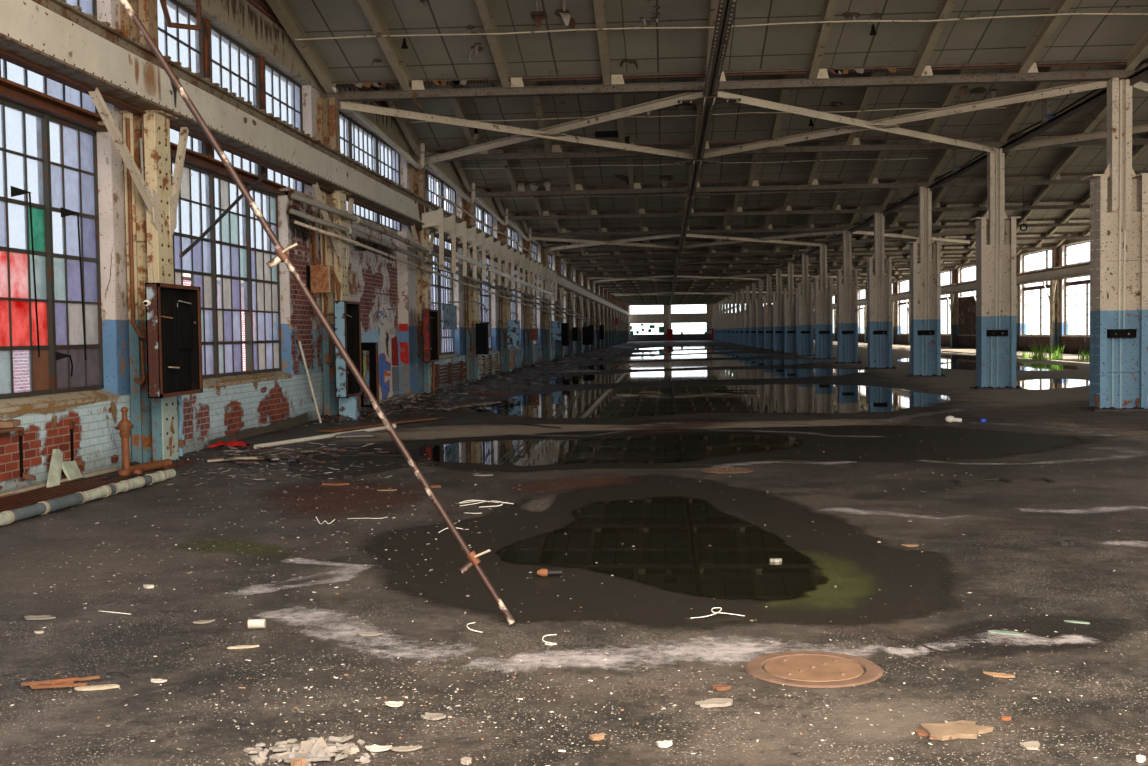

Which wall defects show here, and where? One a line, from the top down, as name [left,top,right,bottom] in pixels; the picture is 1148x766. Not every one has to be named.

peeling [289,229,313,368]
peeling [360,263,398,329]
peeling [0,411,84,490]
peeling [182,397,210,441]
peeling [224,401,244,435]
peeling [258,380,289,424]